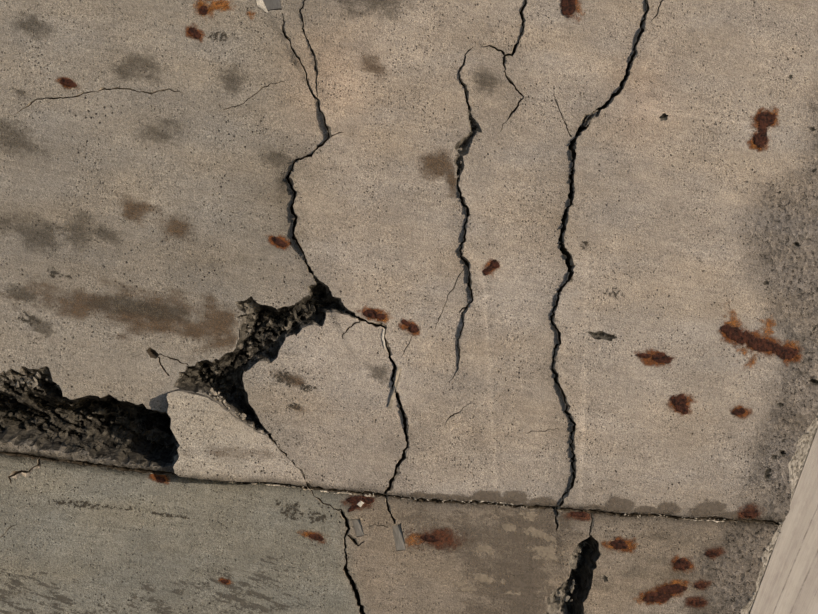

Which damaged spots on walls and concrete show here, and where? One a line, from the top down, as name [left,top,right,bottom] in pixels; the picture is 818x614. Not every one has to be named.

crack [282,0,343,274]
crack [458,0,527,134]
rust [747,107,779,151]
spalling [0,365,179,468]
spalling [174,273,356,435]
crack [267,316,412,614]
crack [435,168,474,384]
crack [527,0,664,530]
rust [635,349,673,366]
rust [720,310,802,367]
spalling [546,535,608,614]
rust [637,556,711,608]